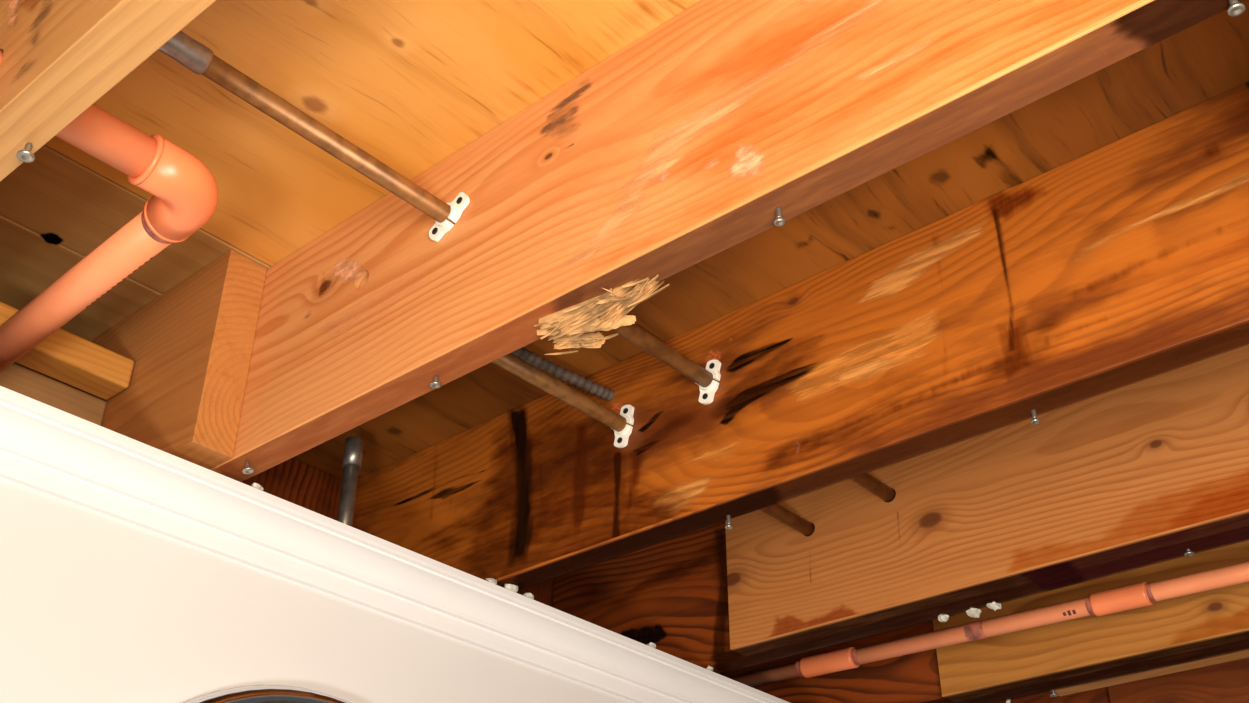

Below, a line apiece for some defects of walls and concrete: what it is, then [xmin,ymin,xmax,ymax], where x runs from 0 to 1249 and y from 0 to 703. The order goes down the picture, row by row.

water stain [542,84,589,132]
water stain [556,0,1245,312]
peeling [541,275,670,355]
crack [720,339,815,424]
water stain [471,320,1249,675]